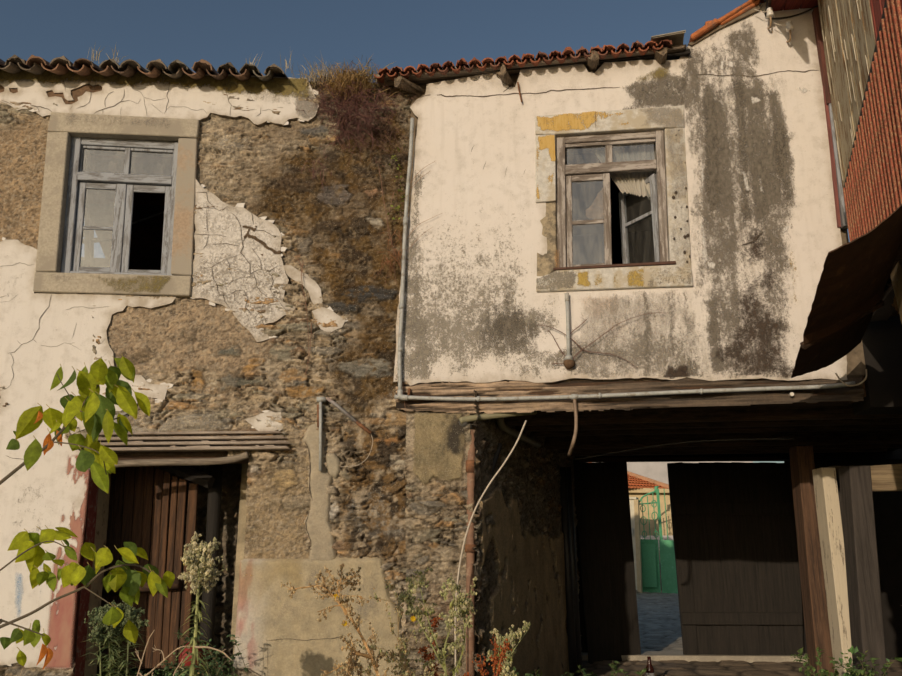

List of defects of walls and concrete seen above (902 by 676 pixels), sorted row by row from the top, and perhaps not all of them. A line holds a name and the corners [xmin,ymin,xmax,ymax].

spalling [46,84,102,106]
crack [30,84,204,114]
crack [422,71,618,97]
peeling [537,111,629,161]
peeling [0,86,50,249]
damp [626,24,794,378]
crack [196,186,286,324]
damp [536,271,576,291]
crack [3,295,108,390]
damp [481,293,538,354]
peeling [92,81,580,676]